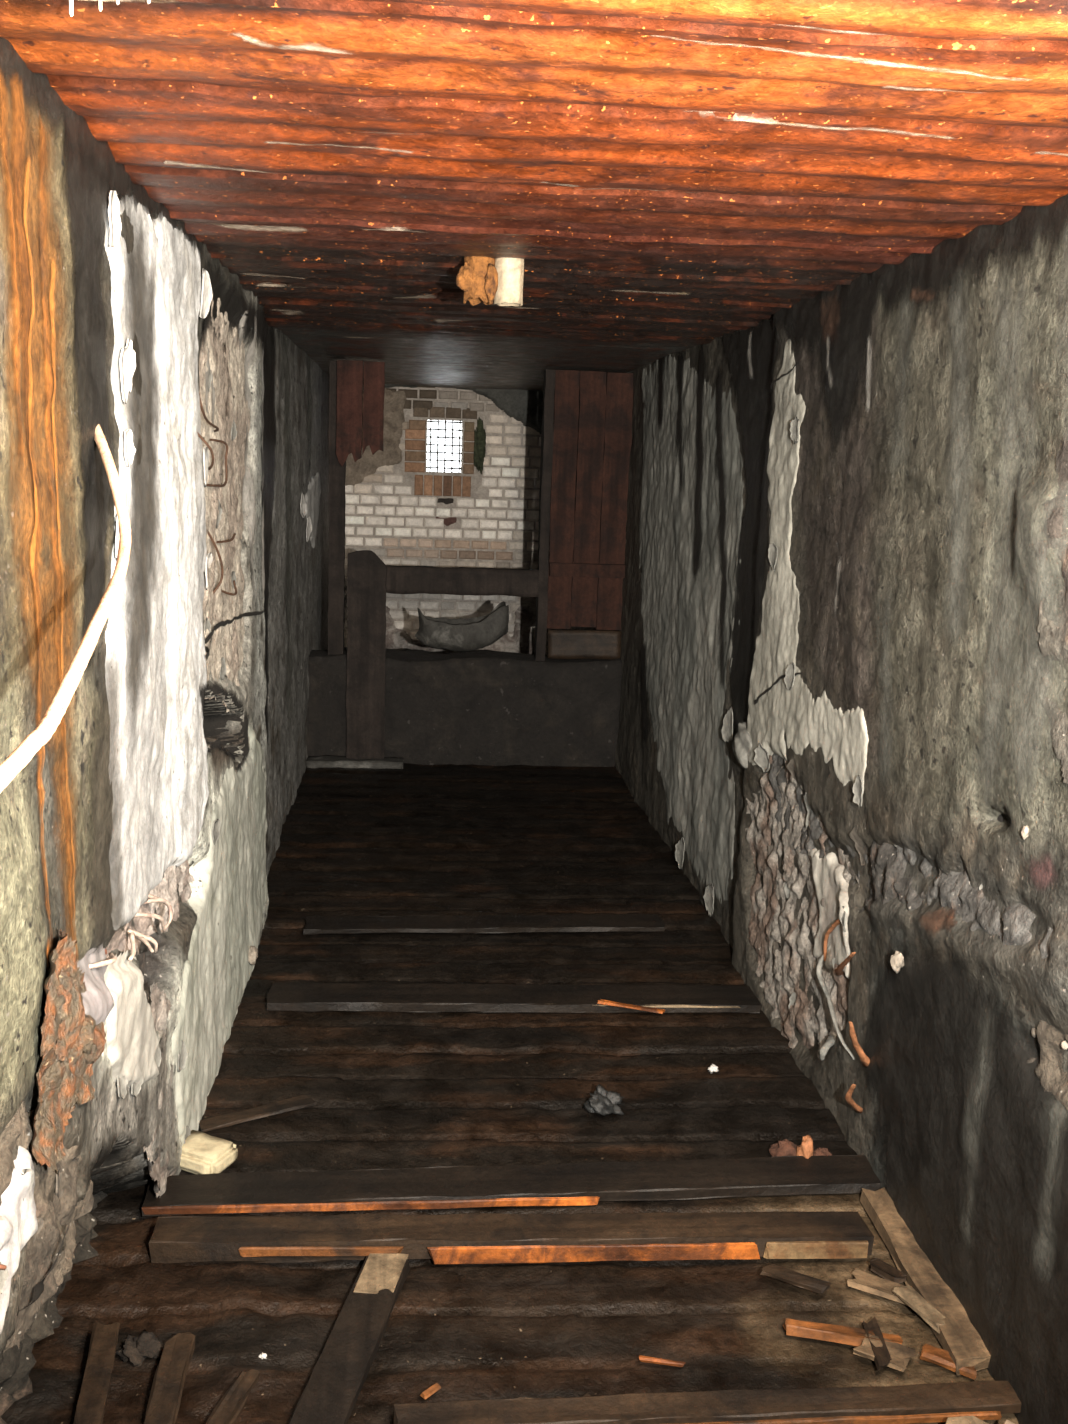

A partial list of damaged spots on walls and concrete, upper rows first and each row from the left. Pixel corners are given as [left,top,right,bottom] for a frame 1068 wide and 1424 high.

rust [0,75,106,1176]
flaking render [0,190,250,1197]
crack [205,609,266,659]
spalling [436,498,457,526]
flaking render [639,338,1054,1058]
spalling [0,1101,94,1352]
water stain [864,950,1068,1424]